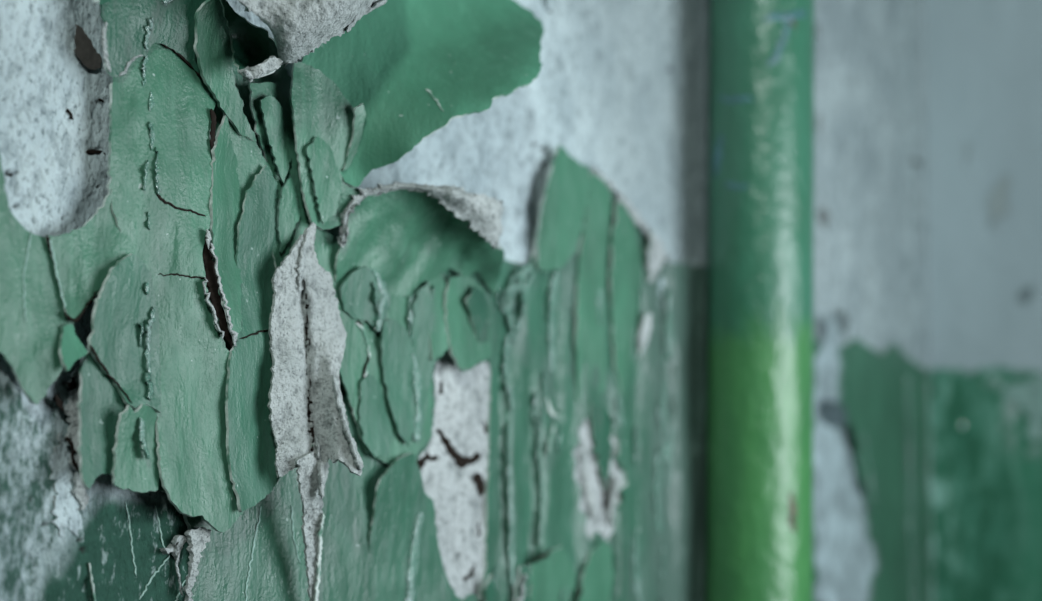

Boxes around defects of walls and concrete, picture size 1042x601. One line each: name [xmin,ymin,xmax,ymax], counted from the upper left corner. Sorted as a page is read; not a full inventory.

crack [162,44,203,80]
crack [209,109,217,150]
crack [23,233,98,323]
crack [156,194,269,348]
peeling [0,0,677,601]
crack [89,345,132,403]
crack [356,321,371,400]
spalling [813,311,880,601]
crack [125,502,187,601]
crack [245,507,261,601]
crack [531,549,552,563]